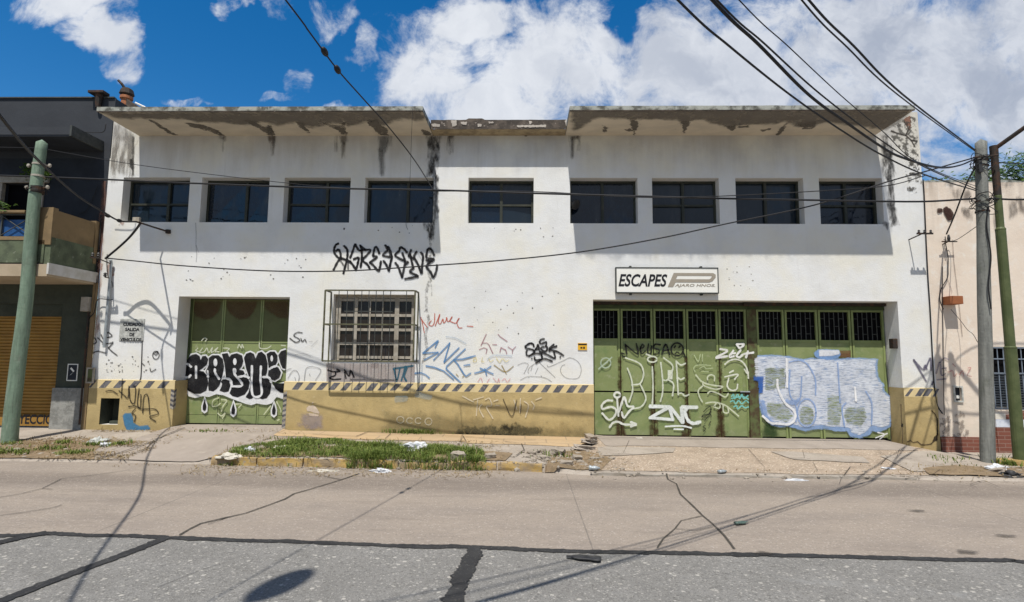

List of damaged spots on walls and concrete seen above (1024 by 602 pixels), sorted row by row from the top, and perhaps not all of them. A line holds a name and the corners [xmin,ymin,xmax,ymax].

leakage [423,136,451,238]
peeling [421,120,493,136]
leakage [883,116,922,228]